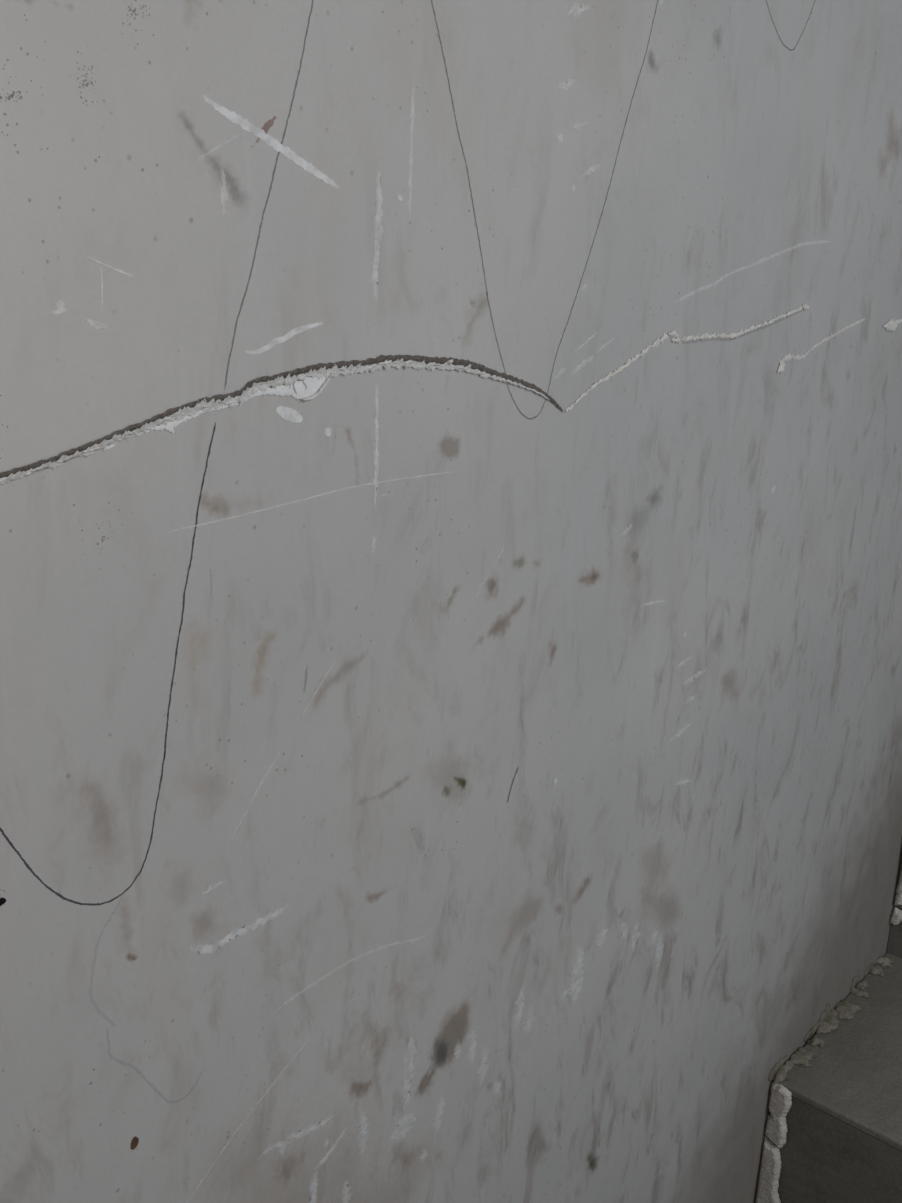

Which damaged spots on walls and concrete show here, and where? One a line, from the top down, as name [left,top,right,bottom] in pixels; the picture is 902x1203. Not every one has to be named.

crack [0,304,809,484]
crack [777,319,902,374]
peeling [889,869,902,925]
peeling [755,1082,792,1203]